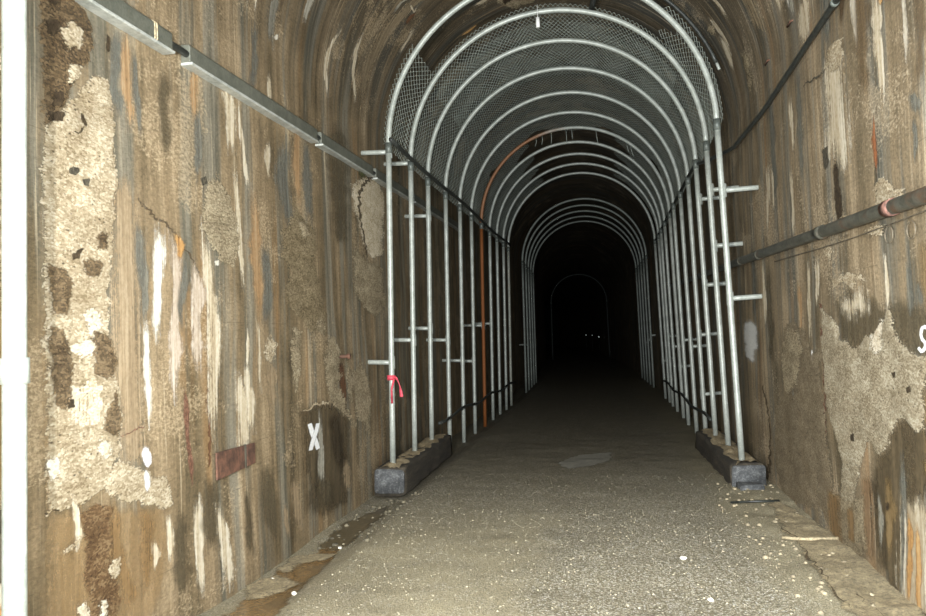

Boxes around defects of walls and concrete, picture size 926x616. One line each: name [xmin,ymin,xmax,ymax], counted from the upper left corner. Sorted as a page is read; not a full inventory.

spalling [35,0,123,517]
damp [151,485,234,591]
damp [264,470,301,534]
peeling [290,327,303,393]
spalling [303,317,372,516]
spalling [820,307,926,502]